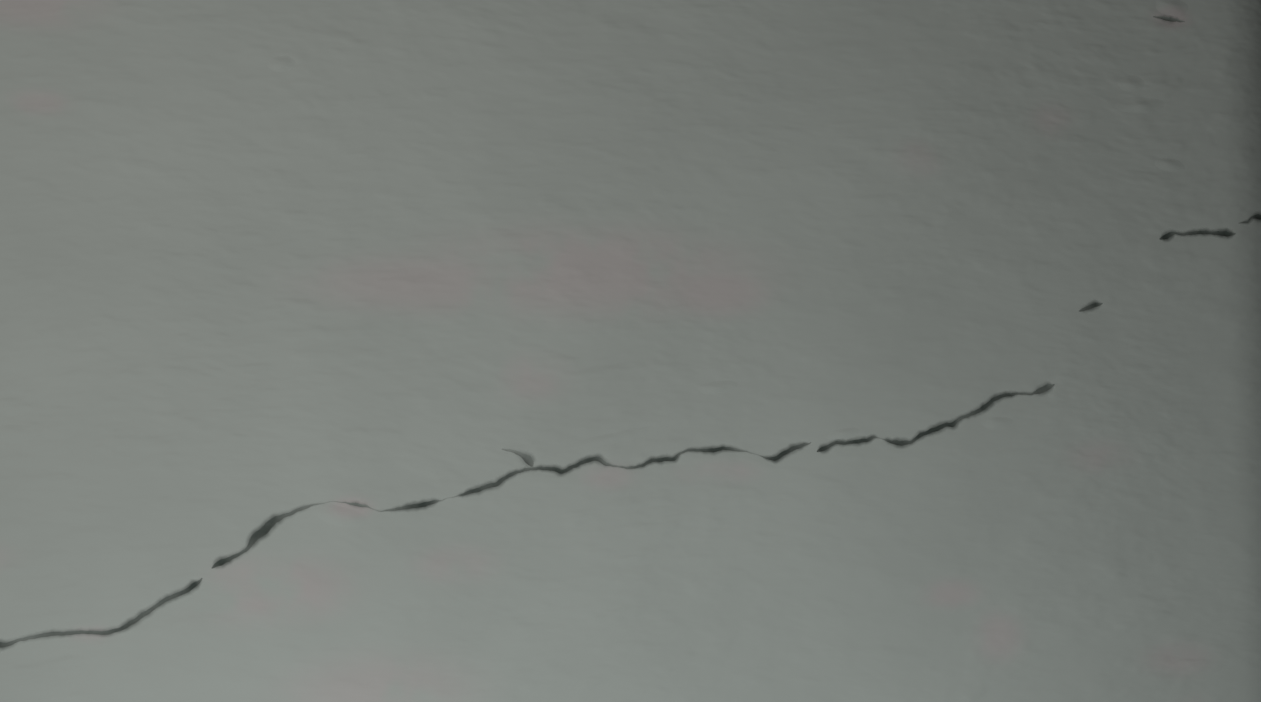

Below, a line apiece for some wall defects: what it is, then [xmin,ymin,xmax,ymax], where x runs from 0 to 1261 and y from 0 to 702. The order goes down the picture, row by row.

crack [1159,214,1261,240]
crack [0,384,1055,648]